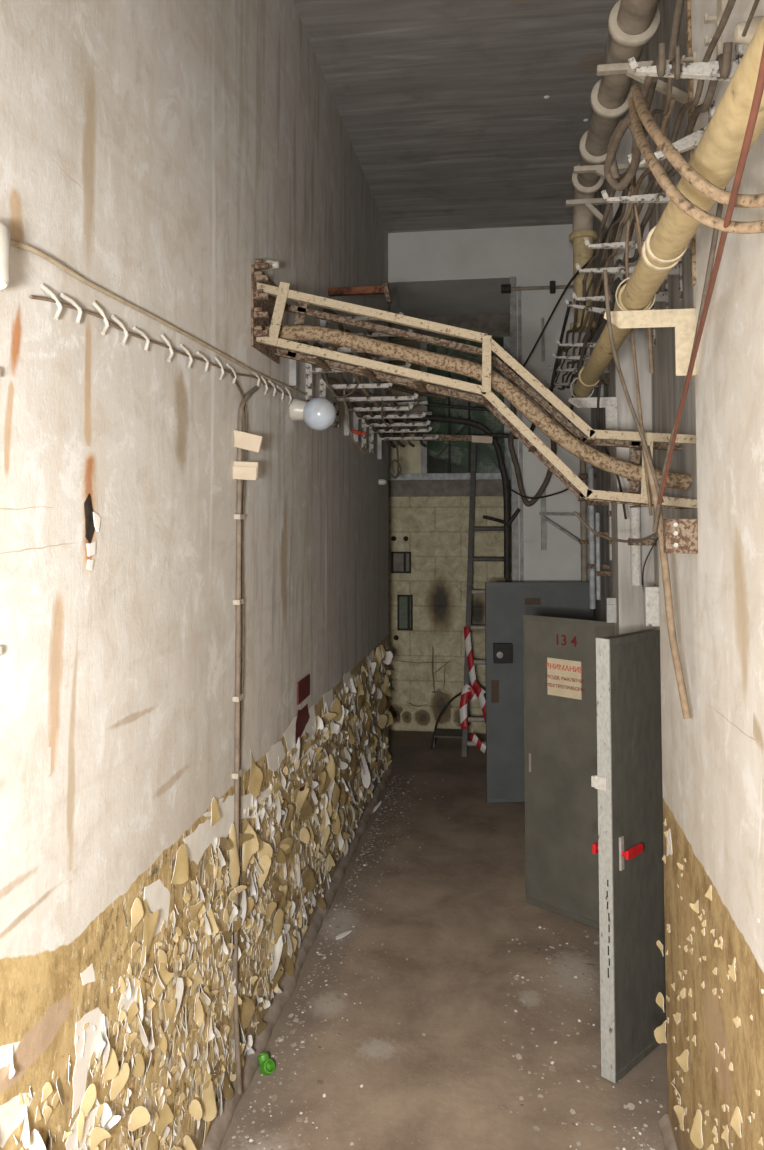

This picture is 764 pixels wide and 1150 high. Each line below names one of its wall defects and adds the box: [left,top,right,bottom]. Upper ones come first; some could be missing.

corrosion [43,313,103,947]
peeling [0,642,450,1150]
peeling [613,1125,656,1150]
peeling [654,819,755,1150]